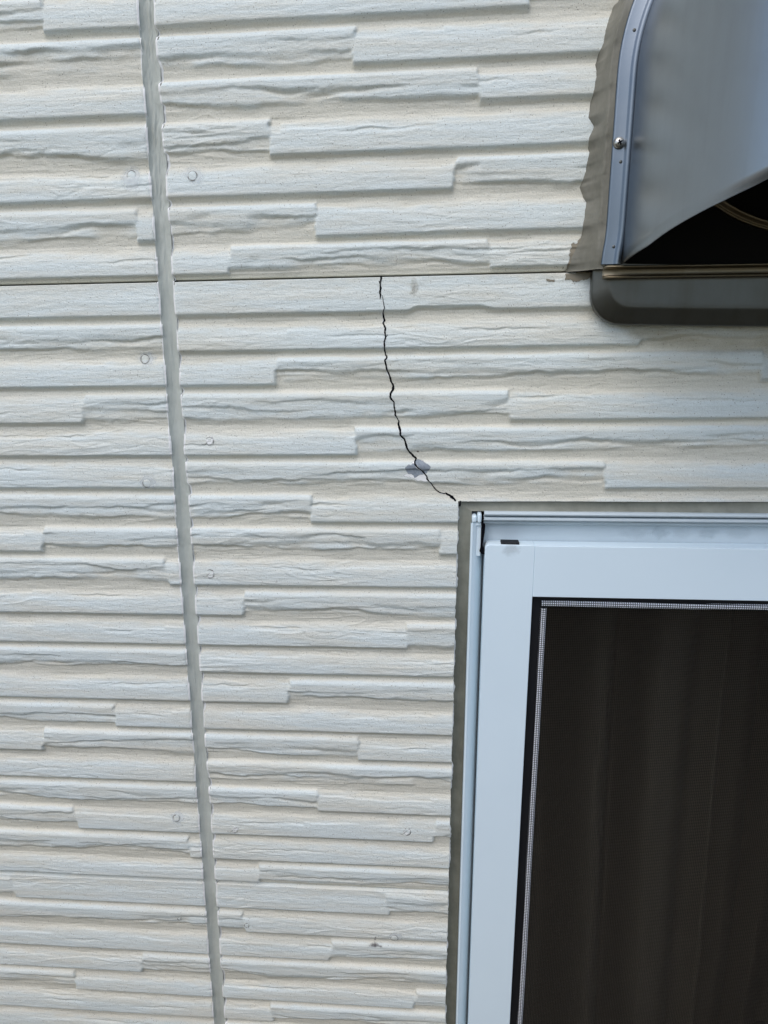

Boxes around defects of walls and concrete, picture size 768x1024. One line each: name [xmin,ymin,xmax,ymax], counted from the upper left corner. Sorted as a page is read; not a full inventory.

crack [379,276,461,506]